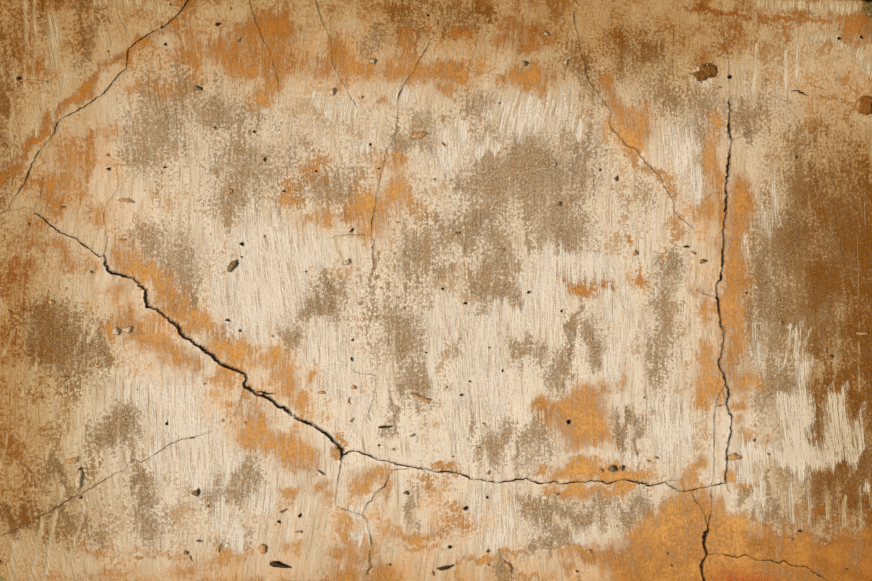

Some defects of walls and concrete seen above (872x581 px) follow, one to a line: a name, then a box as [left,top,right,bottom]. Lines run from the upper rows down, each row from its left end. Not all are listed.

crack [0,0,189,214]
crack [334,37,433,266]
flaking render [352,0,501,63]
crack [573,0,694,231]
peeling [756,0,872,28]
crack [1,101,823,581]
flaking render [113,18,872,535]
peeling [348,493,379,548]
peeling [463,471,655,581]